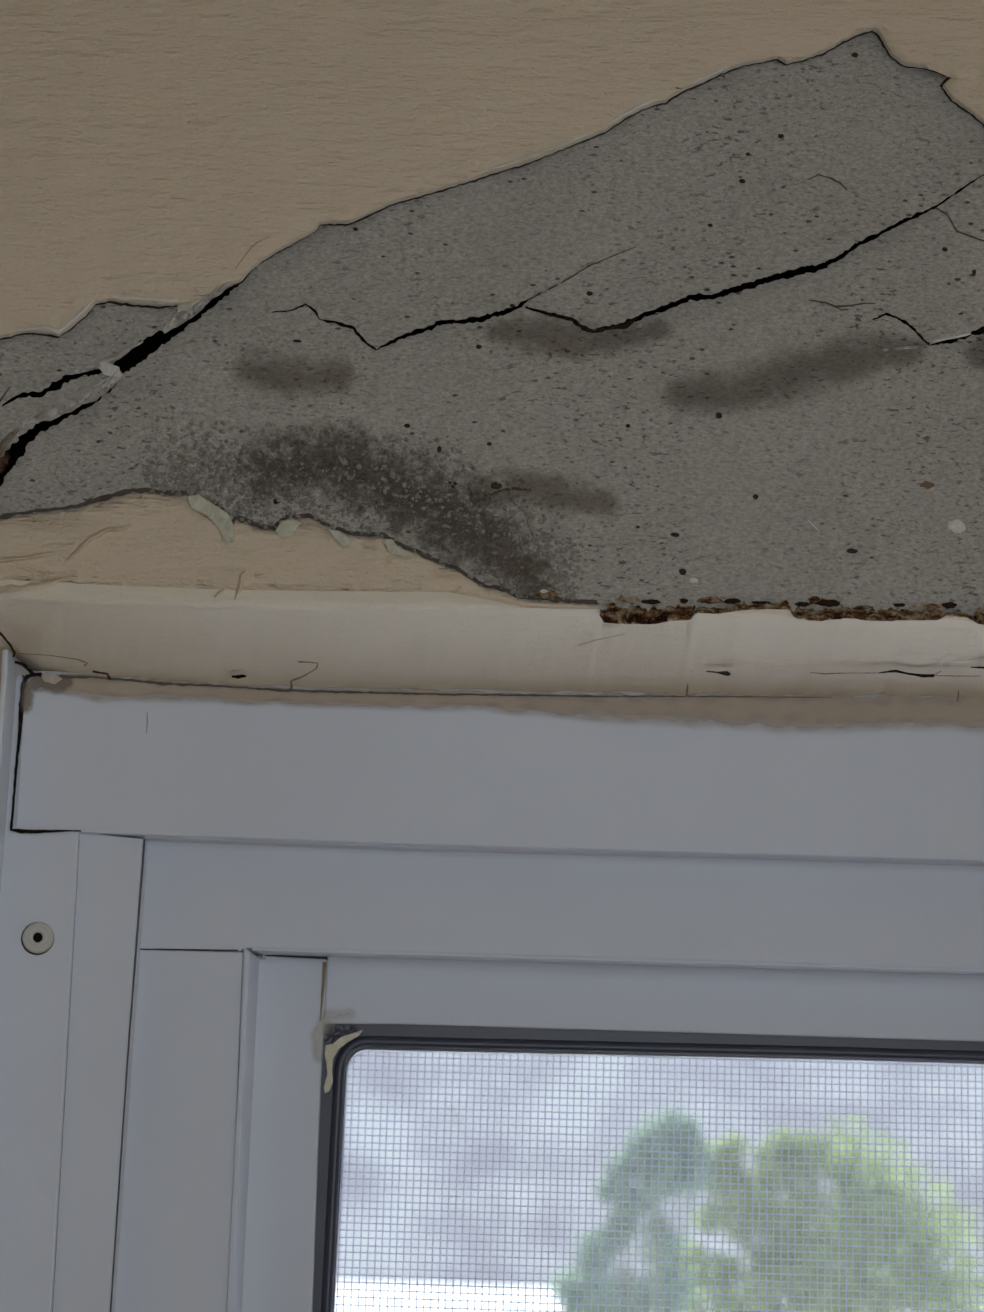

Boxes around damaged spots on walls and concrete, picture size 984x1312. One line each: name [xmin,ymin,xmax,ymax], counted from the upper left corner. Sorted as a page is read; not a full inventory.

crack [0,236,270,486]
spalling [0,31,984,622]
crack [272,174,984,352]
crack [489,487,531,495]
crack [0,632,111,680]